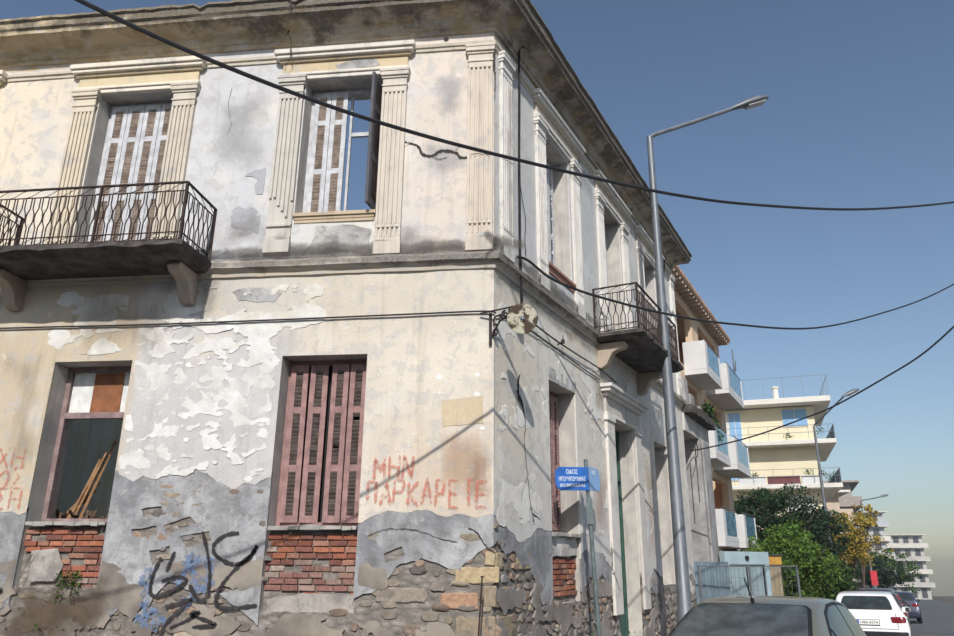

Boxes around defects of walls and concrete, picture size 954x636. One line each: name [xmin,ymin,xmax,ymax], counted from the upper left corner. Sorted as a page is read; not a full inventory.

crack [405,141,513,164]
flaking render [0,284,613,636]
crack [516,375,539,524]